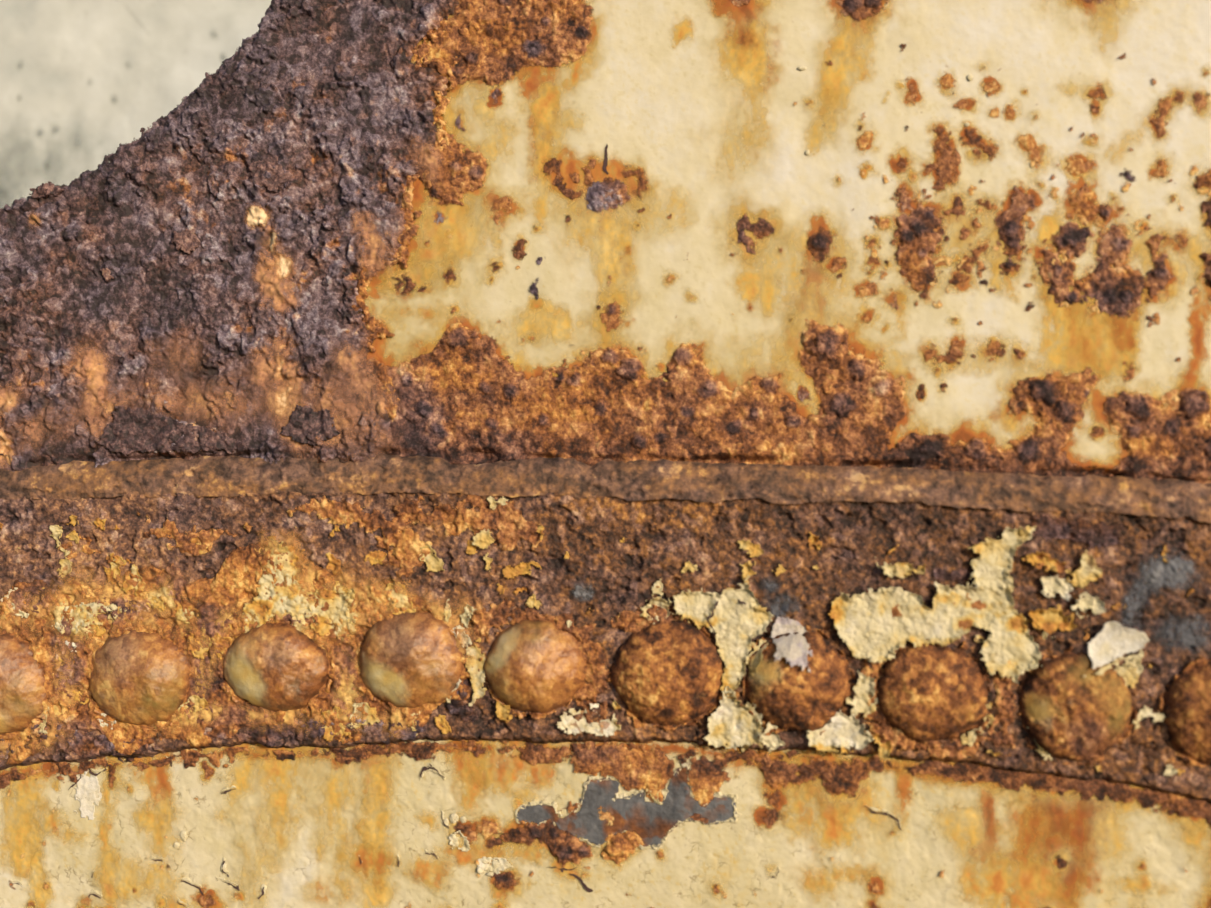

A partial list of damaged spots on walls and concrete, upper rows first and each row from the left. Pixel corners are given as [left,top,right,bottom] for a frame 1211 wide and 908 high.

corrosion [0,0,1211,484]
peeling [49,515,80,578]
peeling [364,550,387,566]
corrosion [0,495,1211,908]
peeling [514,762,742,851]
peeling [639,540,813,753]
peeling [807,526,1209,761]
peeling [1163,762,1185,776]